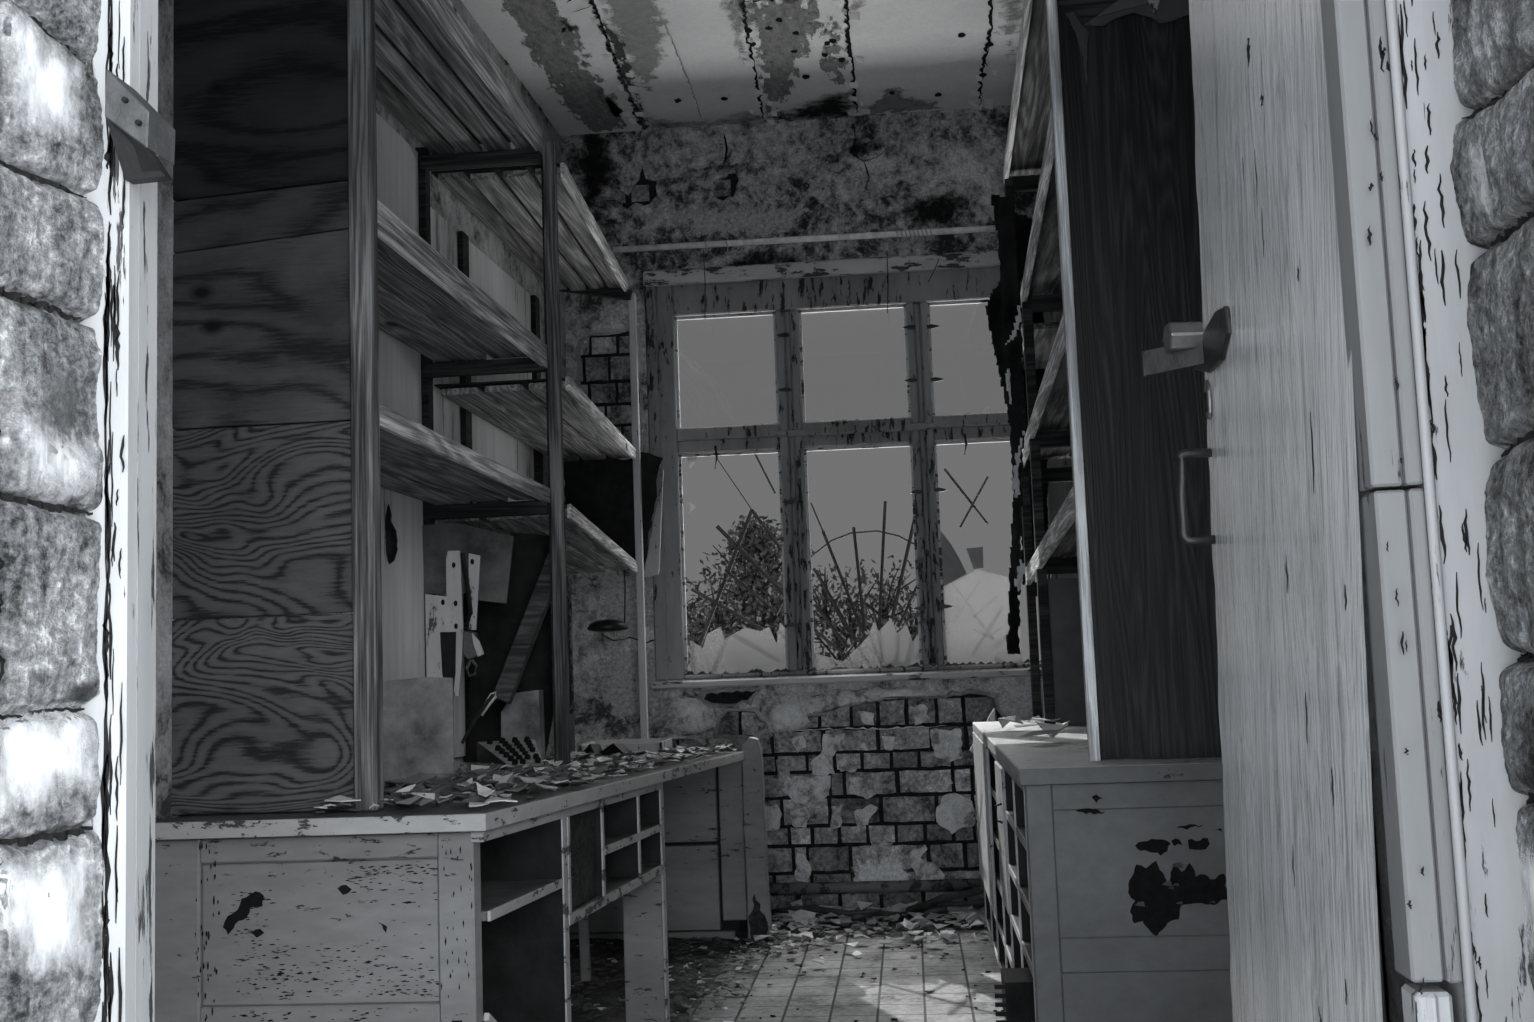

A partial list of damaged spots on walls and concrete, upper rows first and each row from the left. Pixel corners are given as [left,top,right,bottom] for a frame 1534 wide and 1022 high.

peeling [493,0,653,132]
water stain [580,134,610,202]
crack [566,0,643,130]
water stain [731,249,802,266]
peeling [735,0,870,124]
water stain [704,89,938,123]
water stain [906,196,962,224]
crack [977,0,993,105]
flaking render [574,326,646,452]
flaking render [379,686,1007,910]